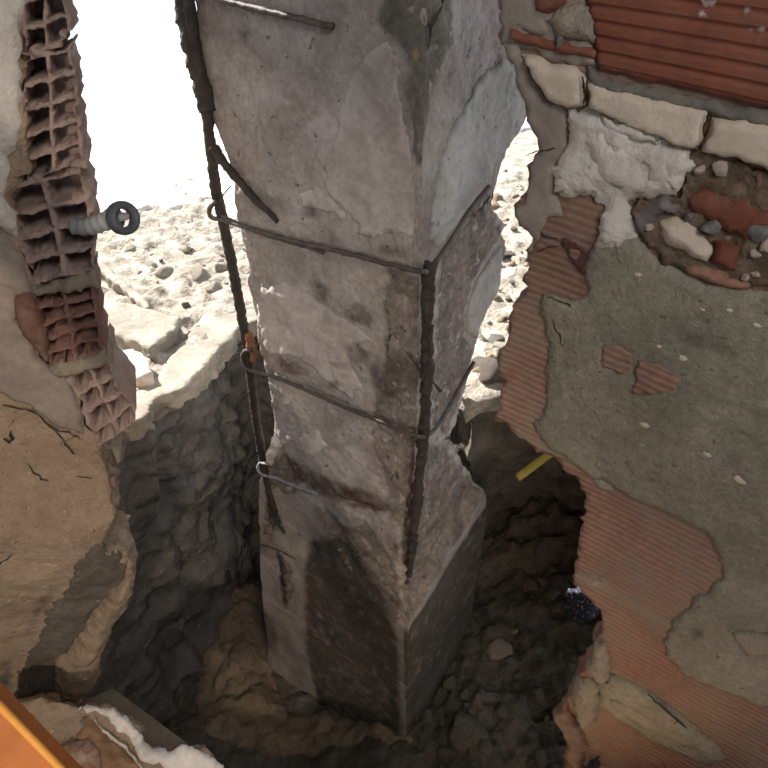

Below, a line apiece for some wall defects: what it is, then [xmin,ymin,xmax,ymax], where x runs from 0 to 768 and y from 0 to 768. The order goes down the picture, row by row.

peeling [0,0,84,434]
peeling [299,0,454,239]
crack [3,405,79,454]
rust [277,555,287,604]
spalling [265,432,307,493]
peeling [257,282,372,399]
spalling [164,492,602,768]
spalling [372,268,419,534]
water stain [305,507,487,735]
spalling [319,448,484,622]
peeling [430,0,768,706]
peeling [595,674,726,766]